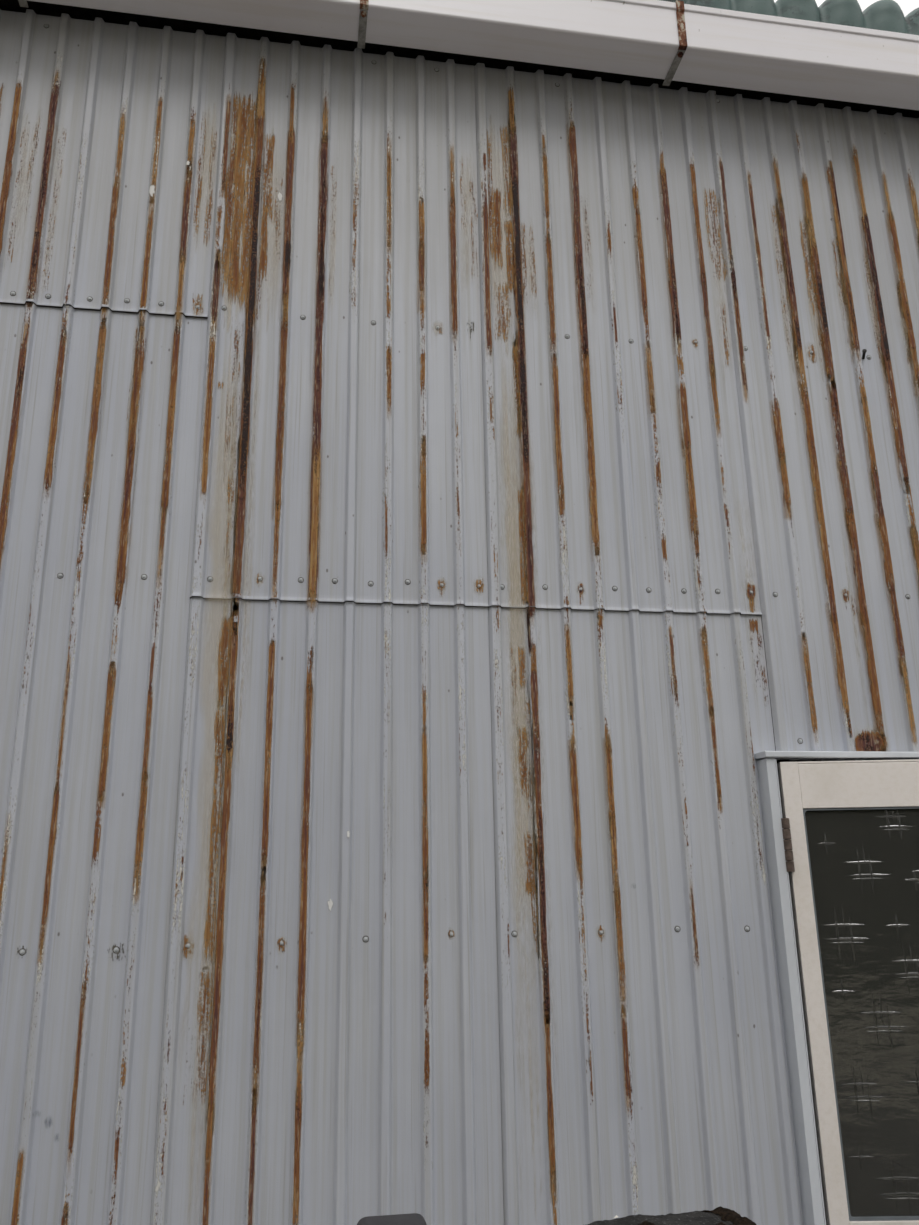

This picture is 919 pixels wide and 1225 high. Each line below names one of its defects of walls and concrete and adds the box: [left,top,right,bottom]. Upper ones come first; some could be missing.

corrosion [11,1153,23,1225]
corrosion [0,51,66,561]
corrosion [36,98,127,994]
corrosion [109,1010,129,1225]
corrosion [133,48,297,1225]
corrosion [278,647,313,1225]
corrosion [308,93,336,608]
corrosion [417,78,633,1225]
corrosion [632,163,667,579]
corrosion [658,144,748,811]
corrosion [745,144,888,751]
corrosion [827,150,919,742]